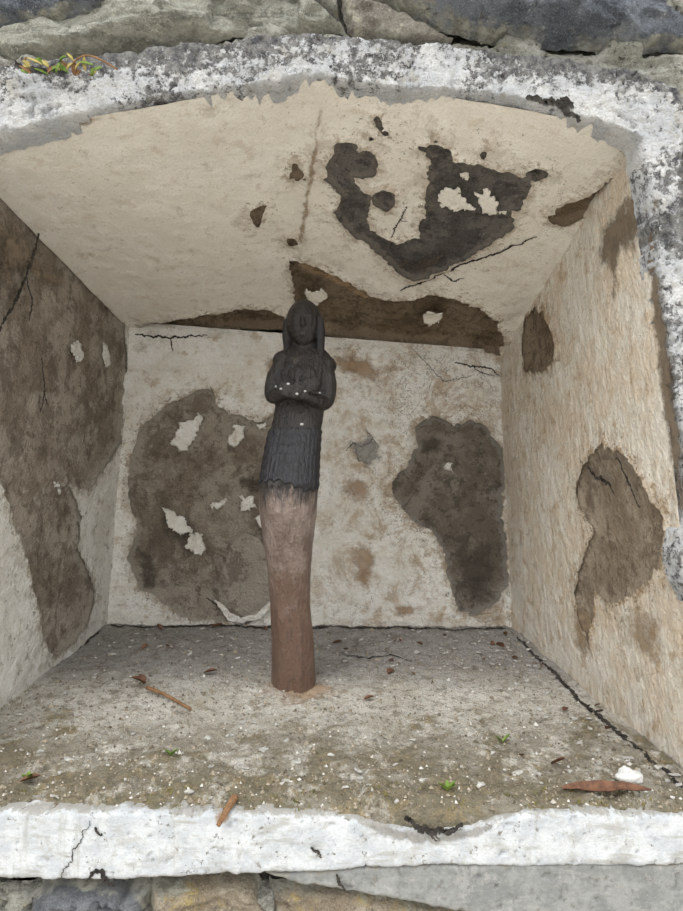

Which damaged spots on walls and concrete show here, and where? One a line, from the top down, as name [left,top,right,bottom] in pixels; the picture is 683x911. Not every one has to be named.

peeling [324,116,548,281]
crack [135,333,205,351]
spalling [155,308,285,330]
spalling [289,261,504,356]
crack [411,347,501,382]
crack [400,237,536,291]
peeling [0,198,127,659]
peeling [127,389,274,624]
peeling [392,416,509,616]
peeling [574,443,664,645]
crack [61,821,115,887]
crack [404,815,463,841]